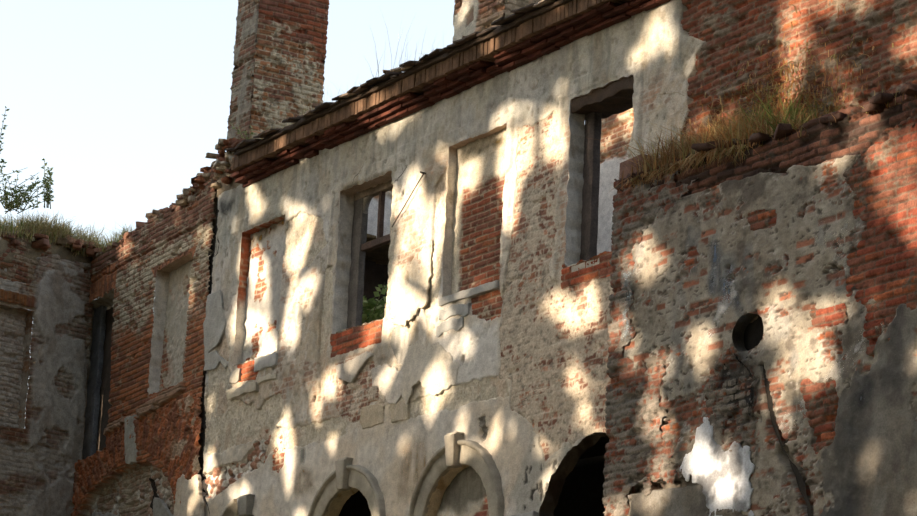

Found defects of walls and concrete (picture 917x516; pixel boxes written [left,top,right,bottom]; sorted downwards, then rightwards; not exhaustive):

flaking render [0,234,52,283]
flaking render [203,0,917,516]
peeling [153,474,205,516]
crack [763,366,812,516]